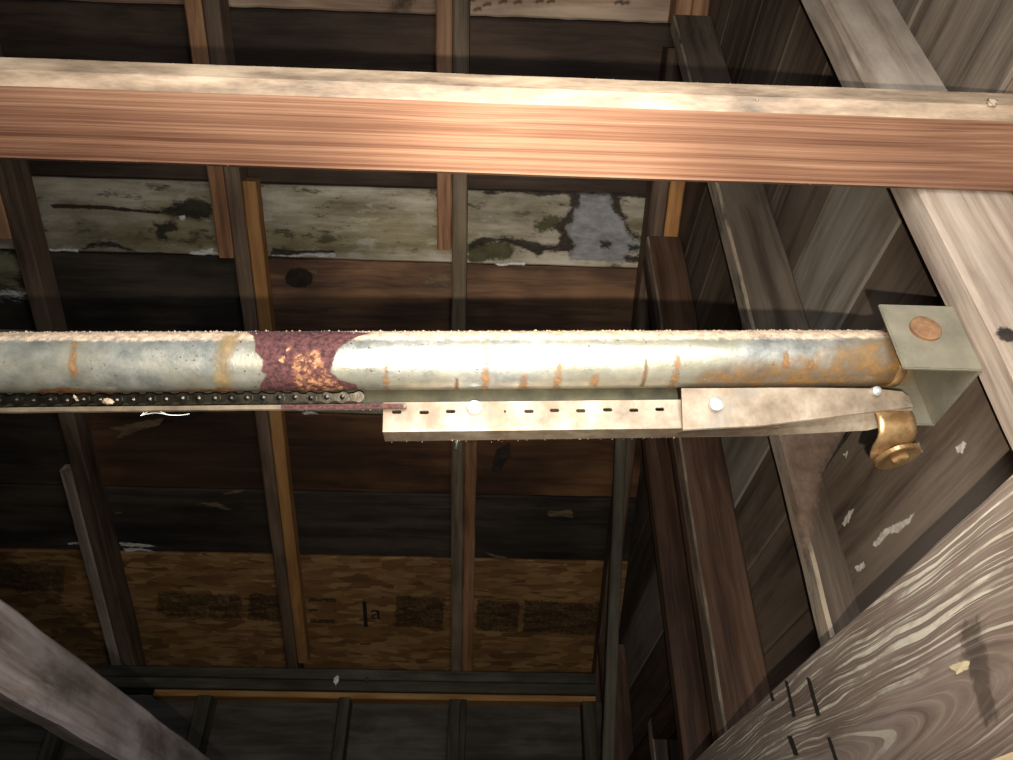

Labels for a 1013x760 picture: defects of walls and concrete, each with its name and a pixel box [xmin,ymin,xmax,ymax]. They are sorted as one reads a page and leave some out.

water stain [154,198,212,241]
water stain [467,190,646,263]
rust [170,331,367,392]
rust [710,342,899,386]